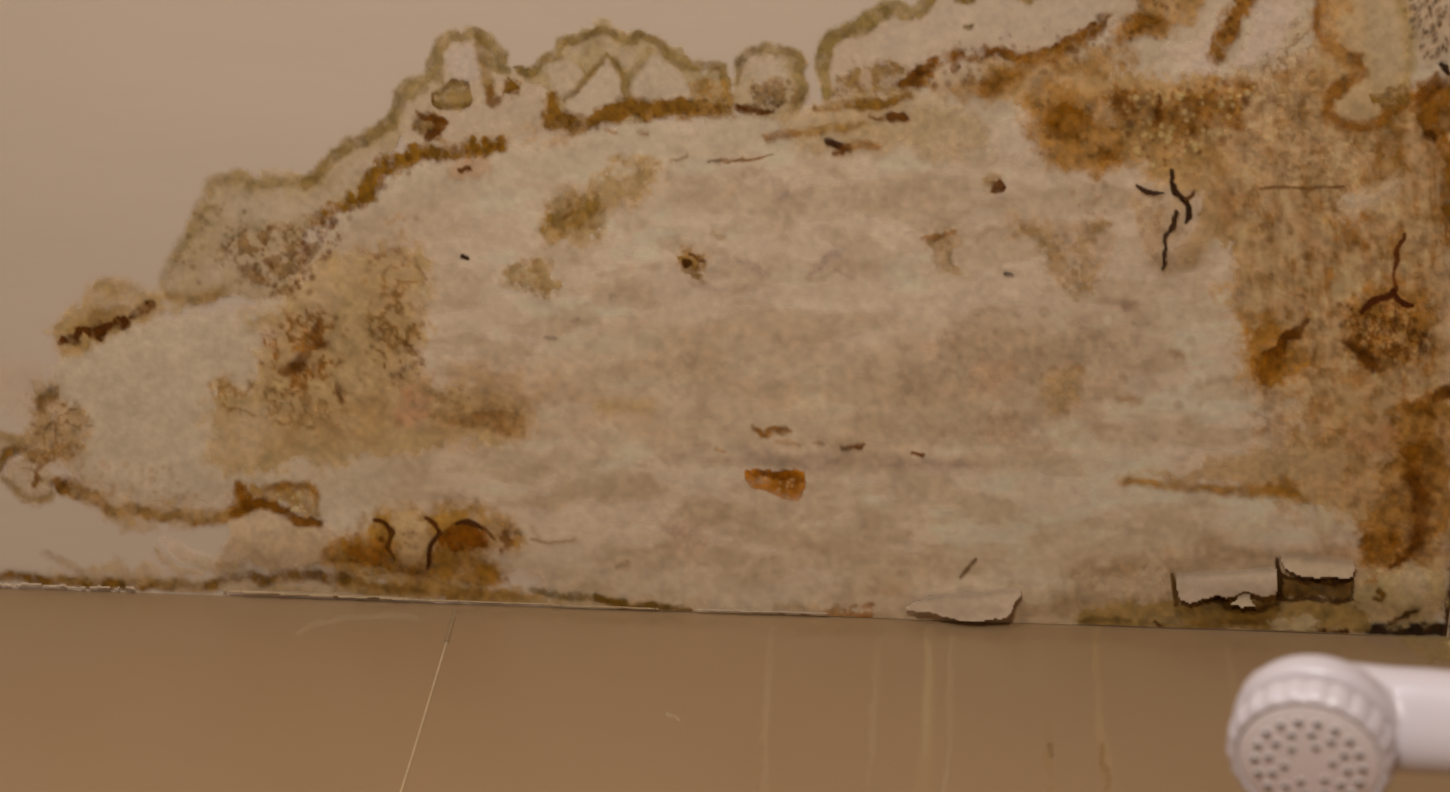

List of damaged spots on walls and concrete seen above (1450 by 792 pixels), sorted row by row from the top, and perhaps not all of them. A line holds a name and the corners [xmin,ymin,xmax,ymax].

crack [1136,169,1195,270]
peeling [52,0,1450,637]
leakage [164,0,1450,594]
crack [1360,233,1414,314]
leakage [0,380,92,502]
leakage [0,568,693,611]
leakage [756,607,872,617]
leakage [1052,563,1292,628]
leakage [1355,587,1450,636]